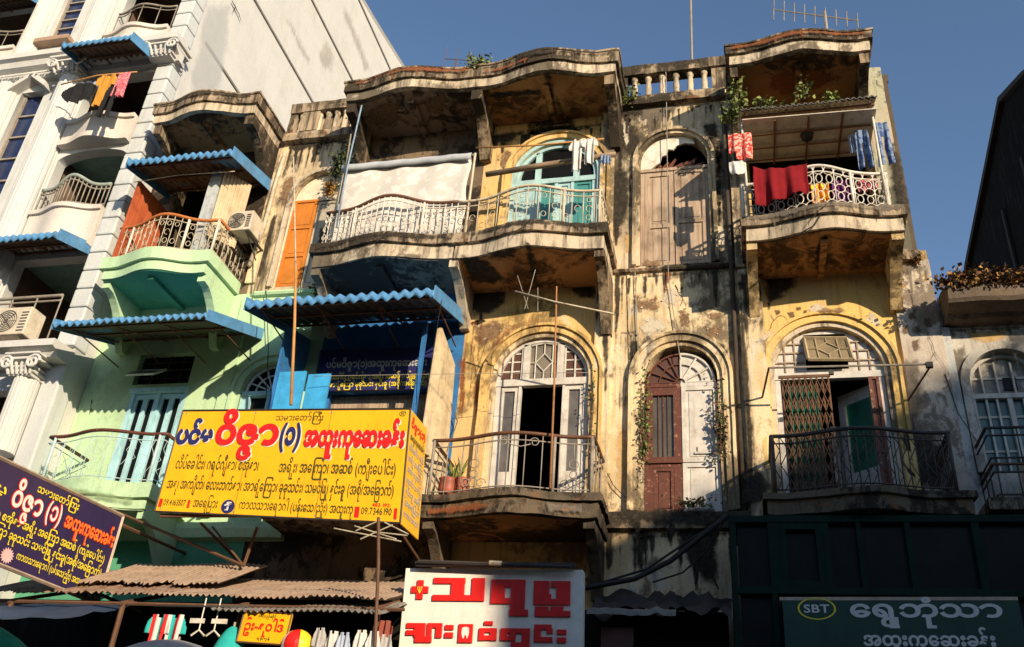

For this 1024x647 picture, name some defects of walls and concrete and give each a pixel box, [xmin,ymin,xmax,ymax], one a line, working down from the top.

damp [491,74,554,100]
damp [493,116,602,153]
damp [461,243,537,356]
damp [572,263,720,391]
peeling [632,288,690,336]
spalling [809,303,845,313]
damp [606,507,731,590]